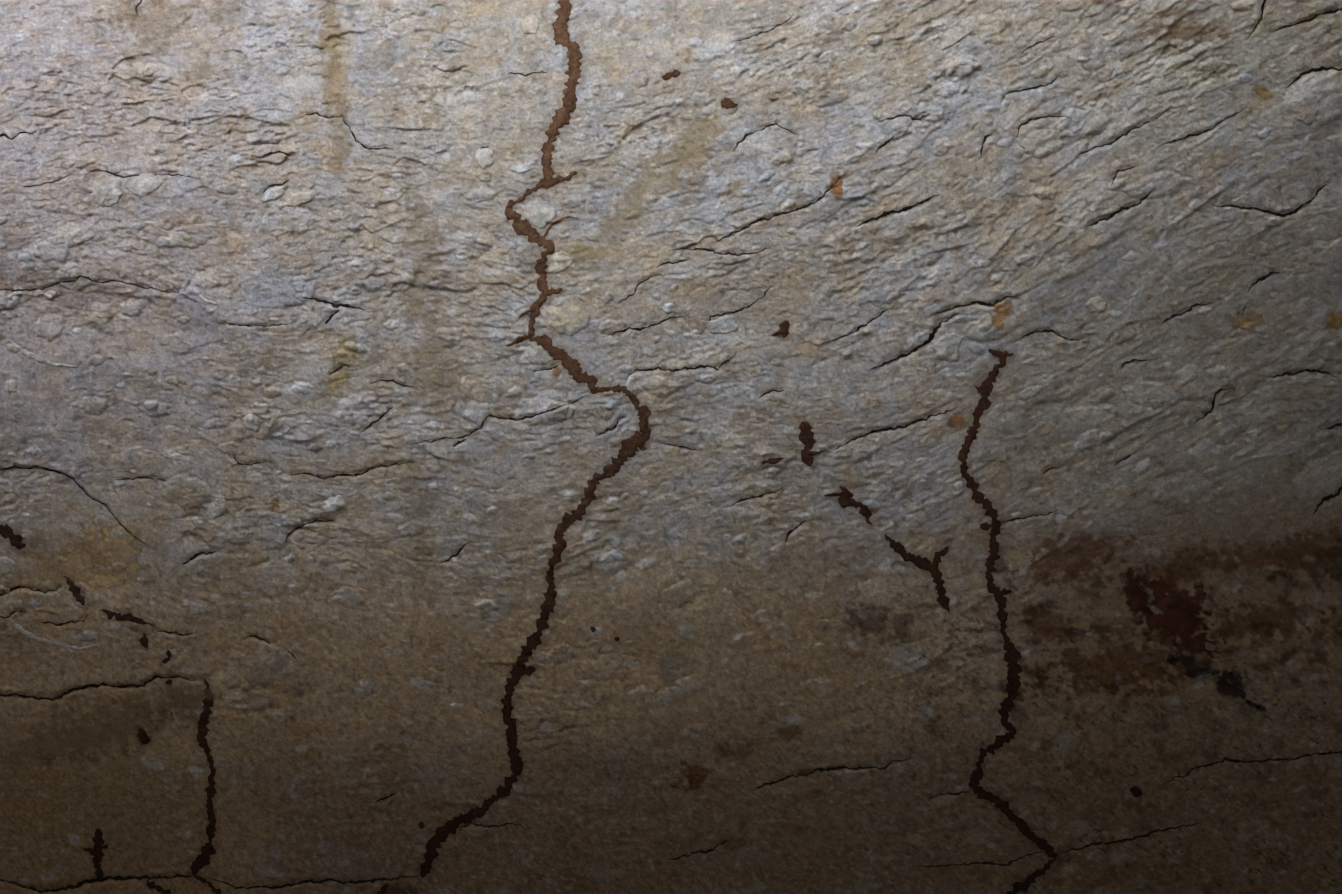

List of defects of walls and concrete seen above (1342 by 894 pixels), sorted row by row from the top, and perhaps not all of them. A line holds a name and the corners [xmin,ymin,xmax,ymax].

crack [329,364,416,432]
crack [234,395,587,480]
crack [0,465,167,549]
crack [183,551,217,564]
crack [440,541,471,563]
crack [0,675,203,701]
crack [457,823,521,834]